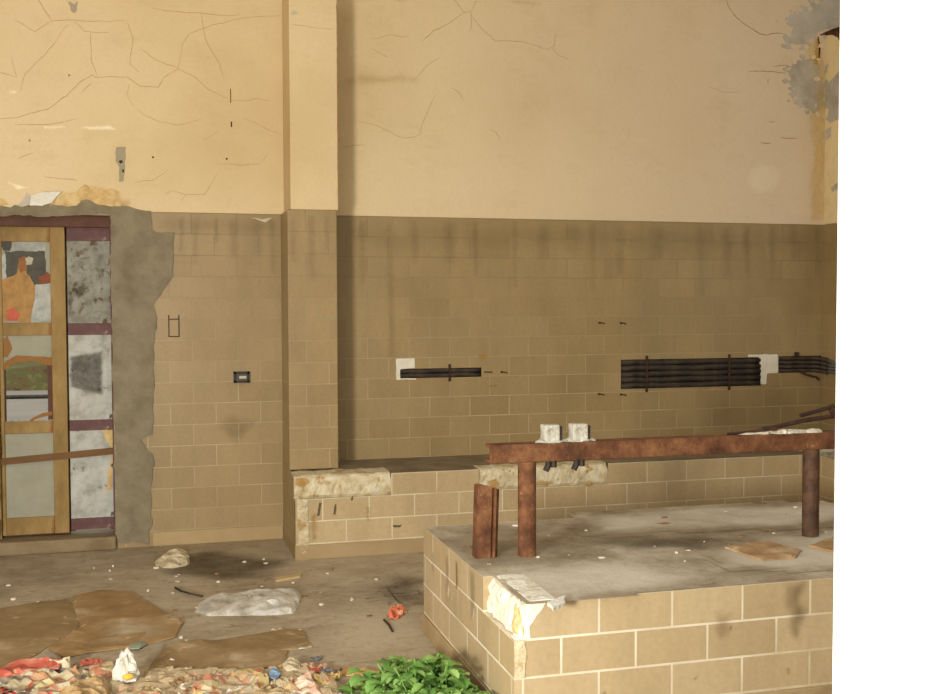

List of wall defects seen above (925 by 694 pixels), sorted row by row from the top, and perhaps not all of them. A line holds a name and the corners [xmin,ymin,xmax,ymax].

crack [0,0,359,210]
crack [373,0,569,60]
peeling [775,0,840,140]
spalling [0,185,121,206]
spalling [290,467,391,554]
spalling [473,463,518,489]
spalling [536,460,607,487]
spalling [487,574,566,679]